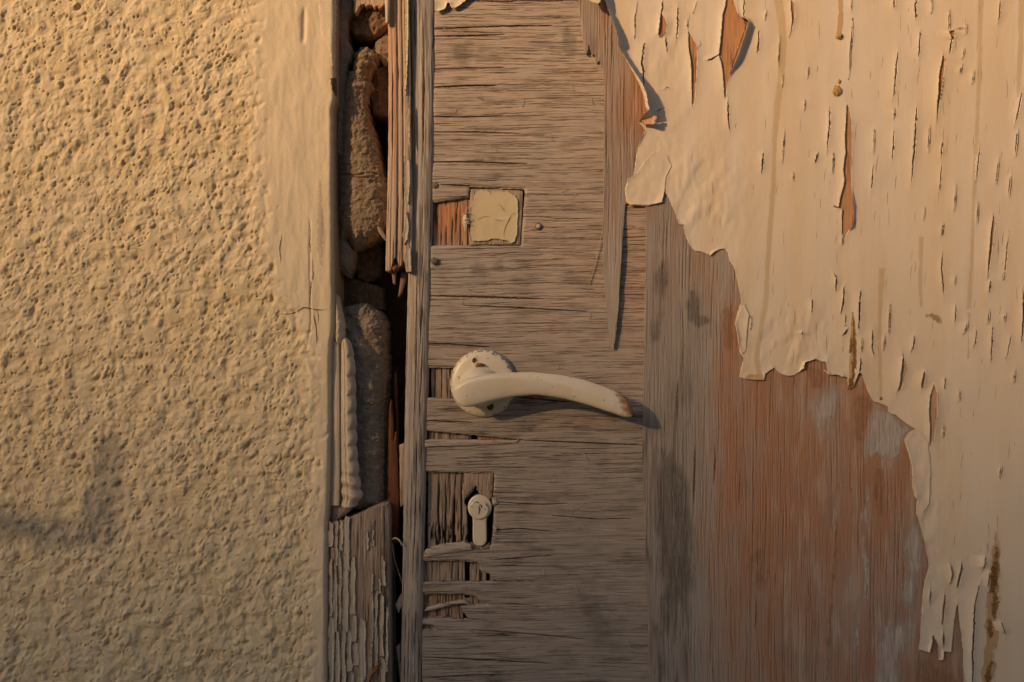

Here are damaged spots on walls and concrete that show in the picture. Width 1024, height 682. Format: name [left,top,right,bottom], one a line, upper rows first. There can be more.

peeling [658,15,667,38]
peeling [688,32,697,104]
peeling [719,0,747,94]
peeling [937,56,945,116]
crack [274,225,328,342]
spalling [372,0,412,456]
peeling [626,152,671,205]
peeling [838,105,853,237]
peeling [898,358,906,391]
peeling [906,373,937,512]
peeling [328,505,404,682]
rust [982,535,1000,682]